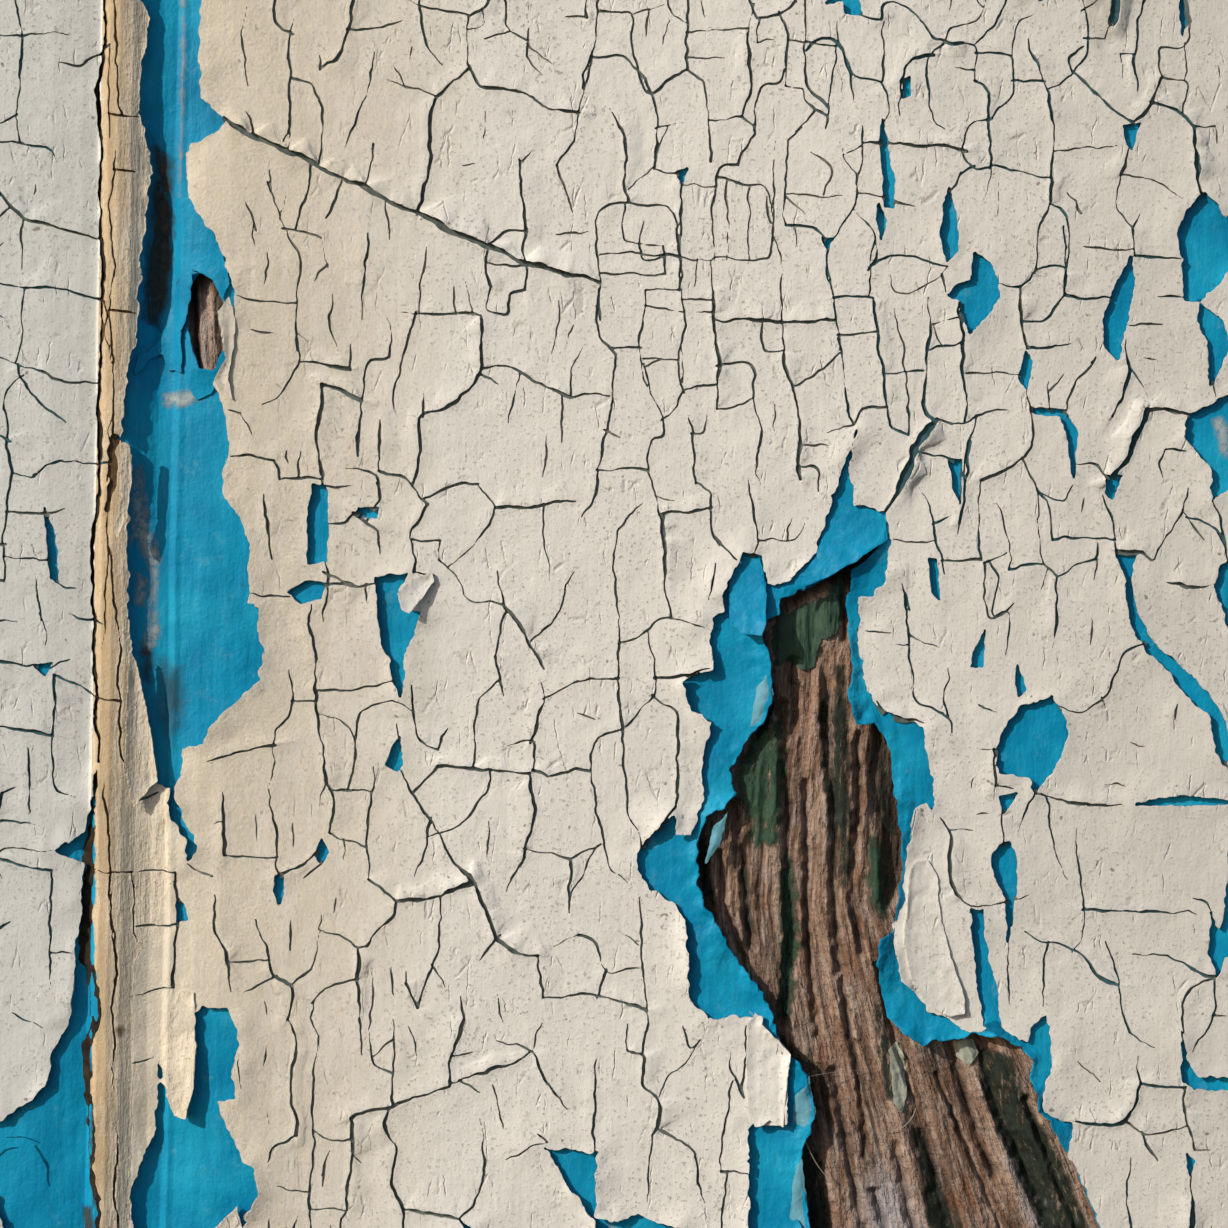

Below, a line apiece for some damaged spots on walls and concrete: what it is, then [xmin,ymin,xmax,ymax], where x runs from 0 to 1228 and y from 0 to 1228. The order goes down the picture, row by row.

crack [0,0,212,1228]
peeling [114,0,264,861]
crack [208,247,737,1228]
peeling [637,429,1100,1228]
crack [857,585,953,733]
crack [894,392,1228,655]
peeling [1115,555,1228,763]
peeling [1177,192,1228,386]
peeling [0,922,99,1228]
peeling [130,991,258,1228]
crack [719,1025,747,1228]
crack [940,748,1226,1228]